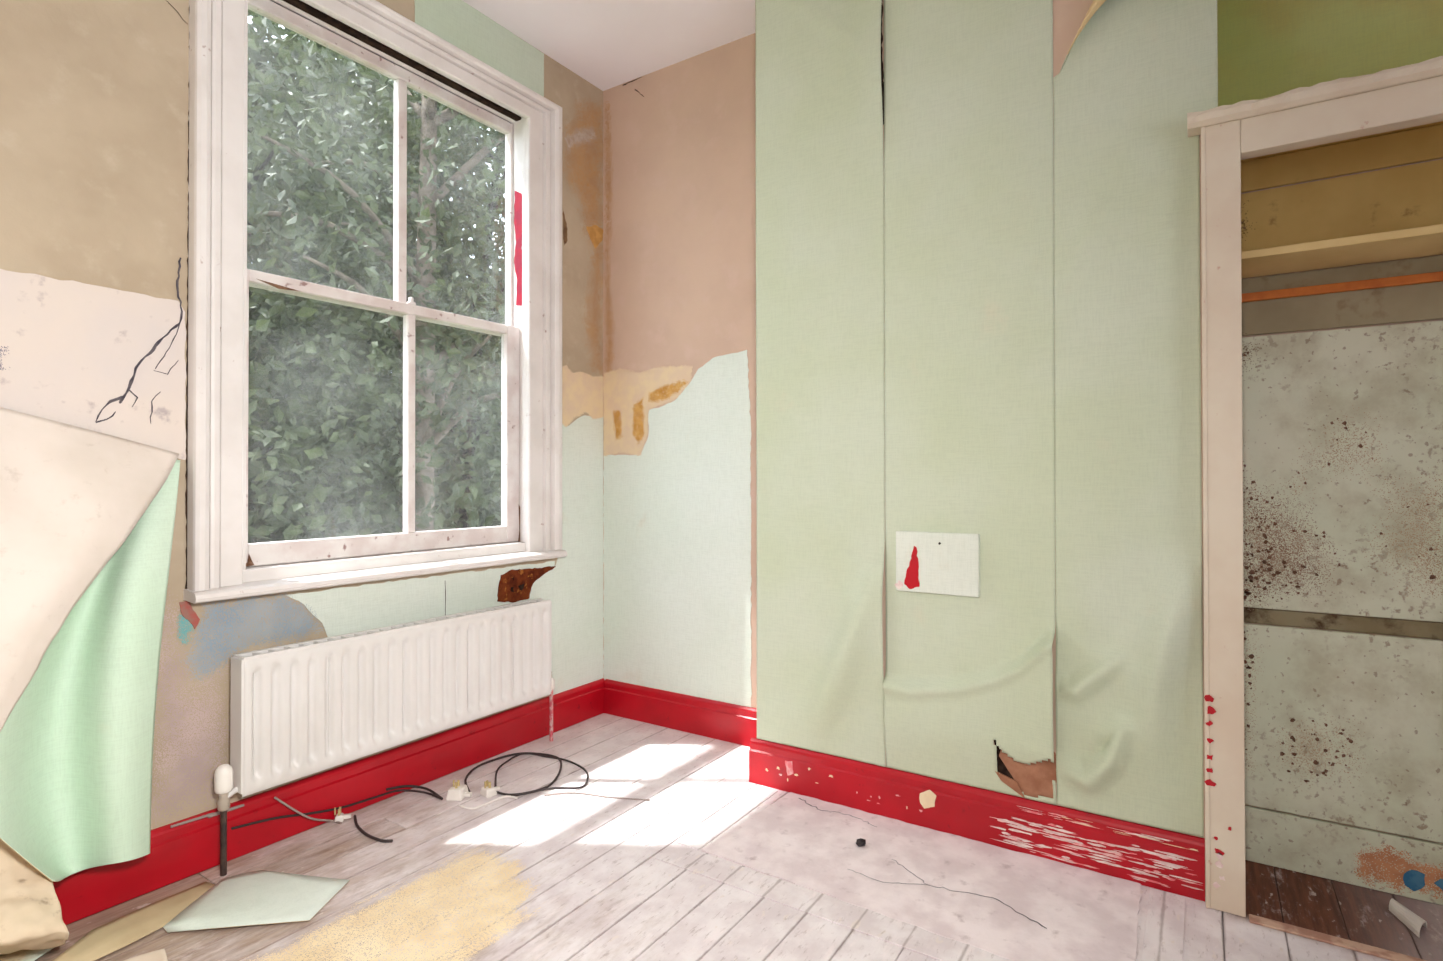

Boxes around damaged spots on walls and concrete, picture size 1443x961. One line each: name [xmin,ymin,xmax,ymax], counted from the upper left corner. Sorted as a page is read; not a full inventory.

crack [95,84,189,589]
peeling [0,460,200,882]
flaking render [497,566,556,603]
peeling [990,740,1231,890]
peeling [1204,695,1216,787]
water stain [1243,405,1443,791]
peeling [1351,843,1443,900]